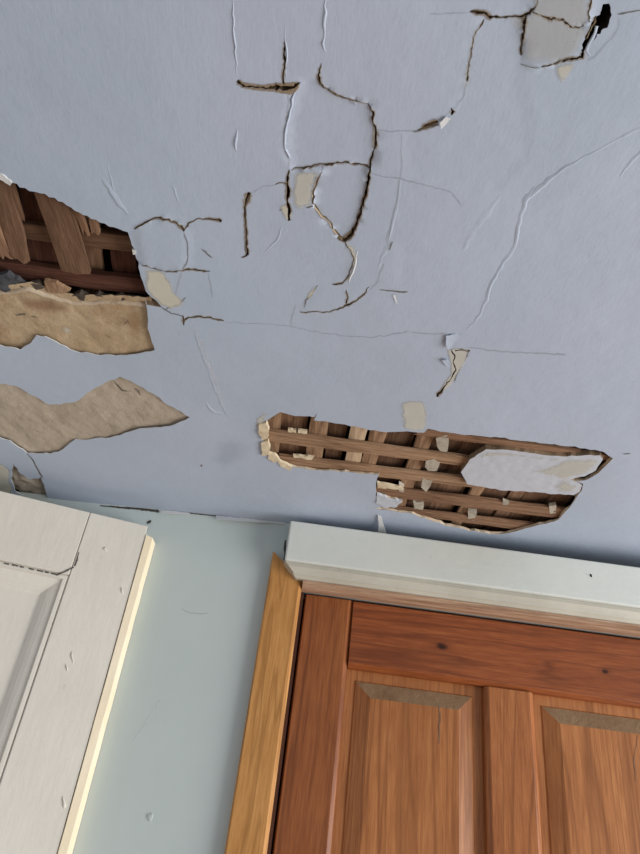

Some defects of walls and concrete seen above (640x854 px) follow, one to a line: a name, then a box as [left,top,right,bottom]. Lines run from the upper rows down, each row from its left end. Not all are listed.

crack [414,108,456,132]
crack [236,26,406,314]
crack [135,217,221,273]
spalling [0,271,181,356]
crack [161,298,224,324]
spalling [0,377,190,454]
flaking render [403,402,426,430]
spalling [257,414,314,471]
spalling [0,464,46,495]
peeling [461,444,603,495]
spalling [376,481,403,533]